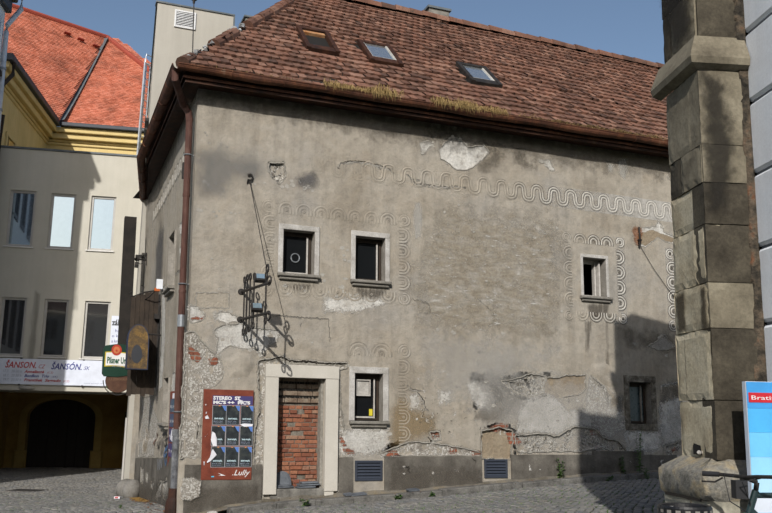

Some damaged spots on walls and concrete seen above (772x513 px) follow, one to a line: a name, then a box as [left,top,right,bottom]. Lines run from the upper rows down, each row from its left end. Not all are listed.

peeling [419,135,490,171]
damp [299,174,315,184]
peeling [632,220,674,248]
peeling [320,273,387,313]
flaking render [138,285,393,501]
flaking render [405,358,682,460]